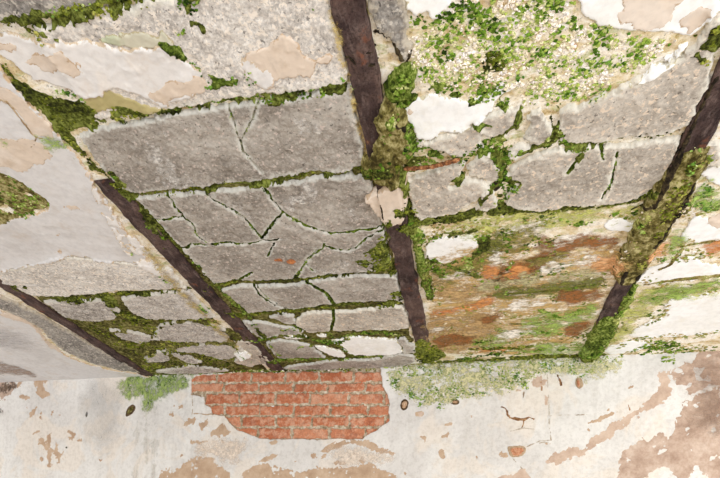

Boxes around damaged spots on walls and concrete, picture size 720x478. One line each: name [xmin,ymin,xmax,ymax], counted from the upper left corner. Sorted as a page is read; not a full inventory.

flaking render [0,30,208,115]
flaking render [241,33,333,90]
crack [229,94,262,159]
crack [566,160,577,175]
crack [599,143,619,199]
crack [142,188,389,330]
corrosion [481,234,624,282]
corrosion [556,290,603,305]
corrosion [433,334,473,348]
corrosion [565,322,589,336]
flaking render [159,368,407,478]
peeling [545,351,720,478]